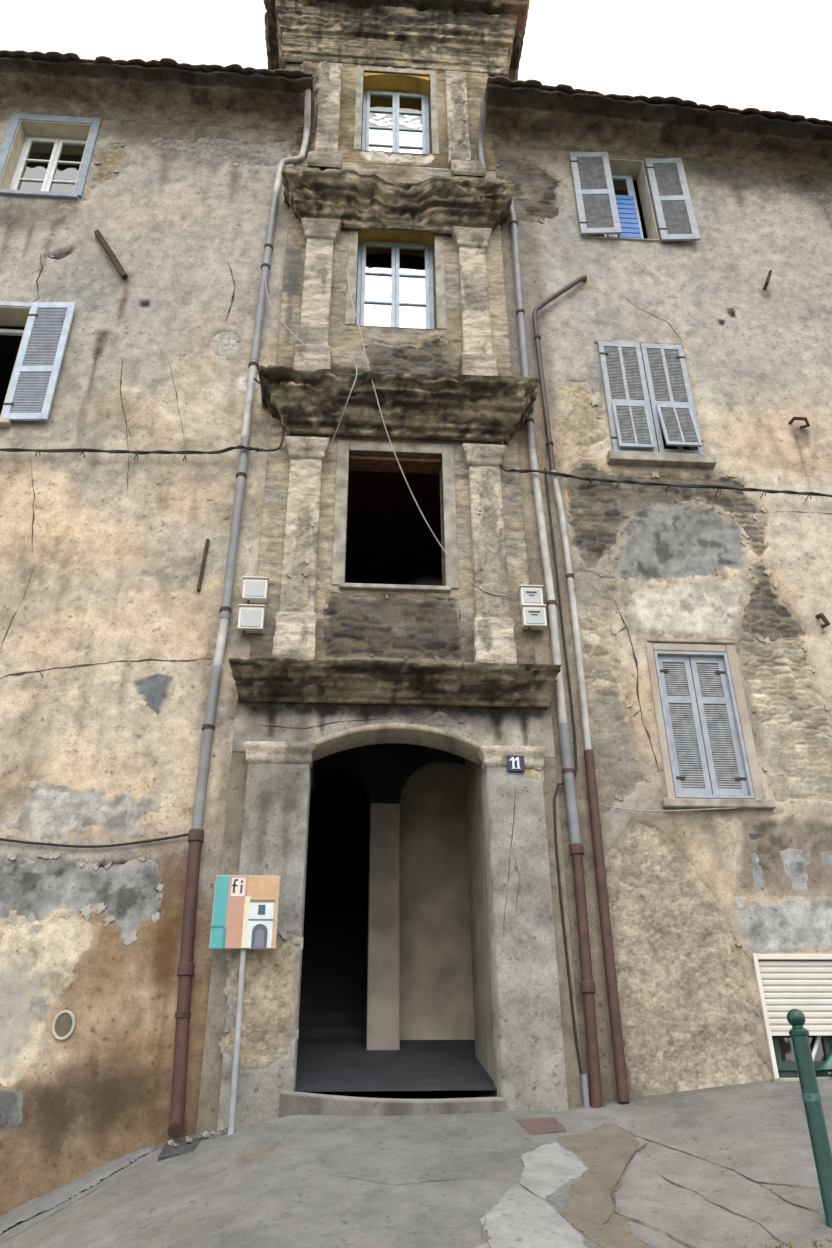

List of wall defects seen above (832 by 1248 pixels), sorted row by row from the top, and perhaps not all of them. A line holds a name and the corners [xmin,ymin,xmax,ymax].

flaking render [552,380,832,814]
peeling [0,834,165,1088]
crack [757,1182,817,1211]